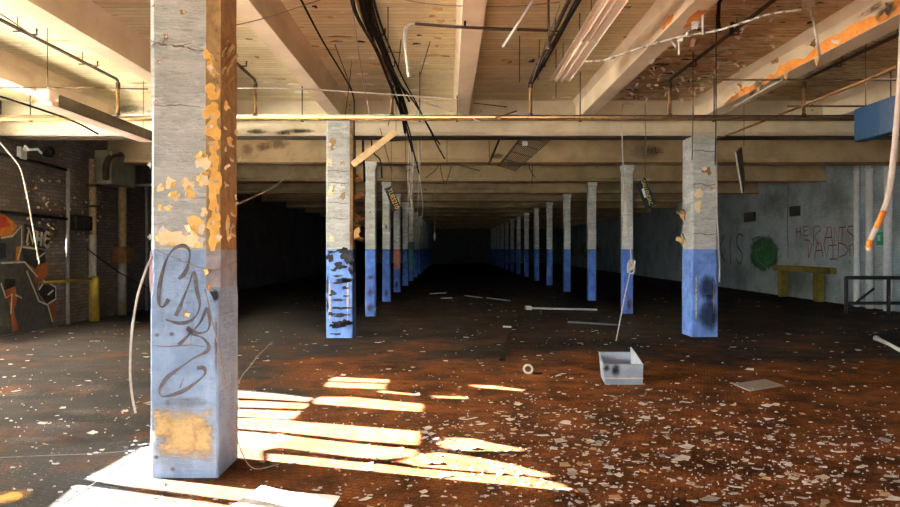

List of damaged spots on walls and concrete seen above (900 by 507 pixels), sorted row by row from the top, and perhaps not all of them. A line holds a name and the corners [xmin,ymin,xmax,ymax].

crack [149,39,204,52]
peeling [617,0,900,105]
peeling [147,39,241,251]
peeling [676,186,714,220]
peeling [326,235,354,335]
damp [700,277,717,330]
peeling [153,411,212,457]